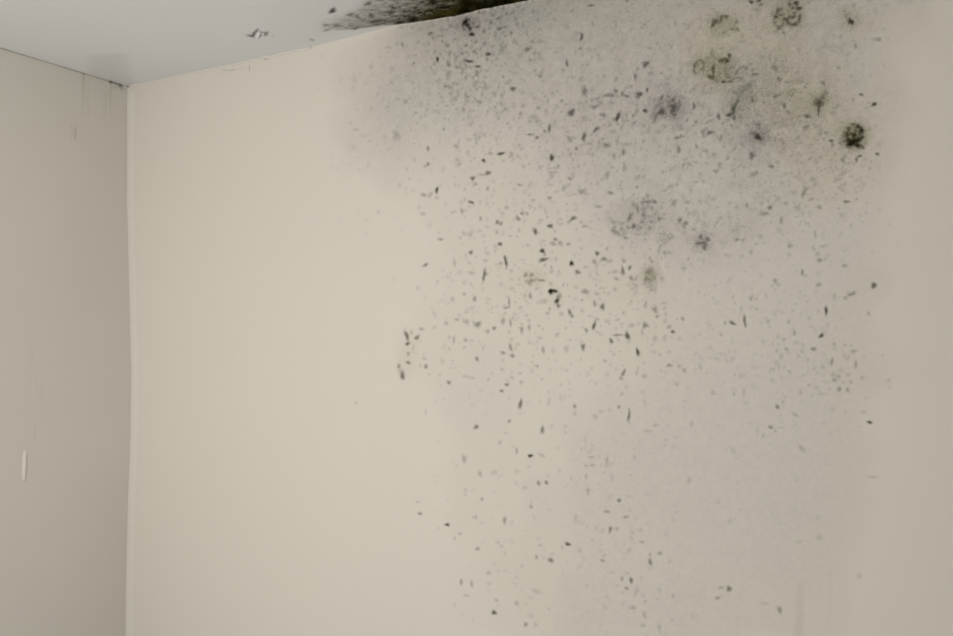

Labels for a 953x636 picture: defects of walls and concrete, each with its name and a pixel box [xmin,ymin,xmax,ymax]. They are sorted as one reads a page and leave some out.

leakage [350,0,528,35]
leakage [846,125,863,147]